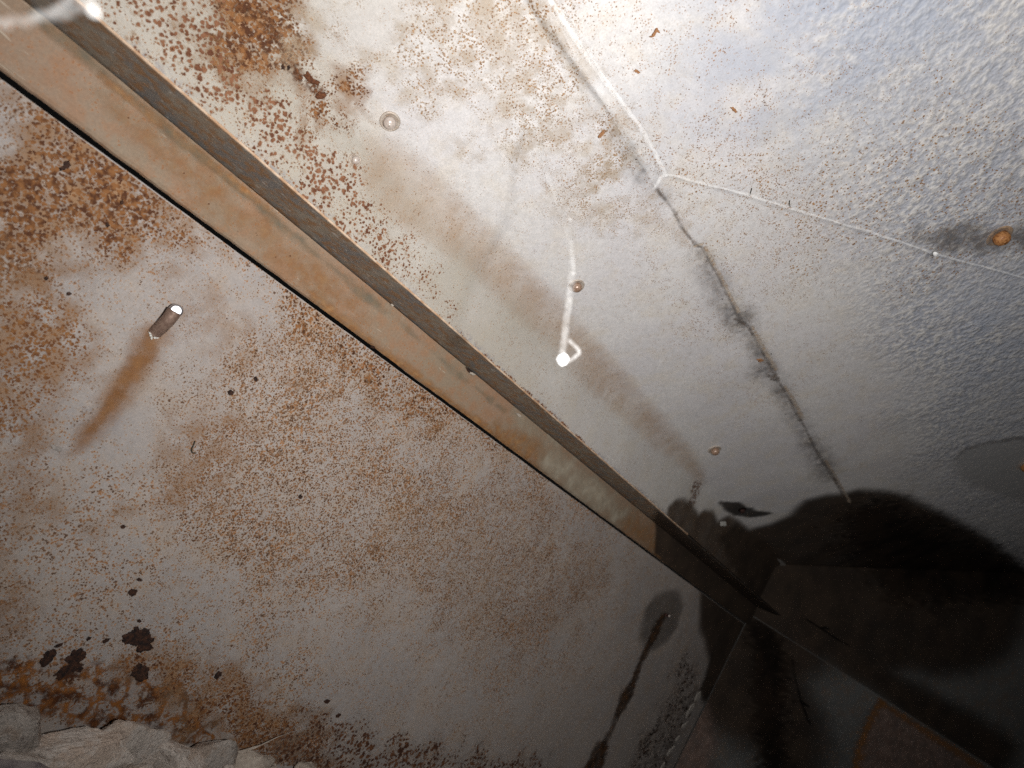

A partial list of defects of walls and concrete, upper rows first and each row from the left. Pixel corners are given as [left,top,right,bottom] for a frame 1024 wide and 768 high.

corrosion [104,0,637,336]
corrosion [676,50,1024,308]
corrosion [0,90,613,768]
damp [585,614,665,768]